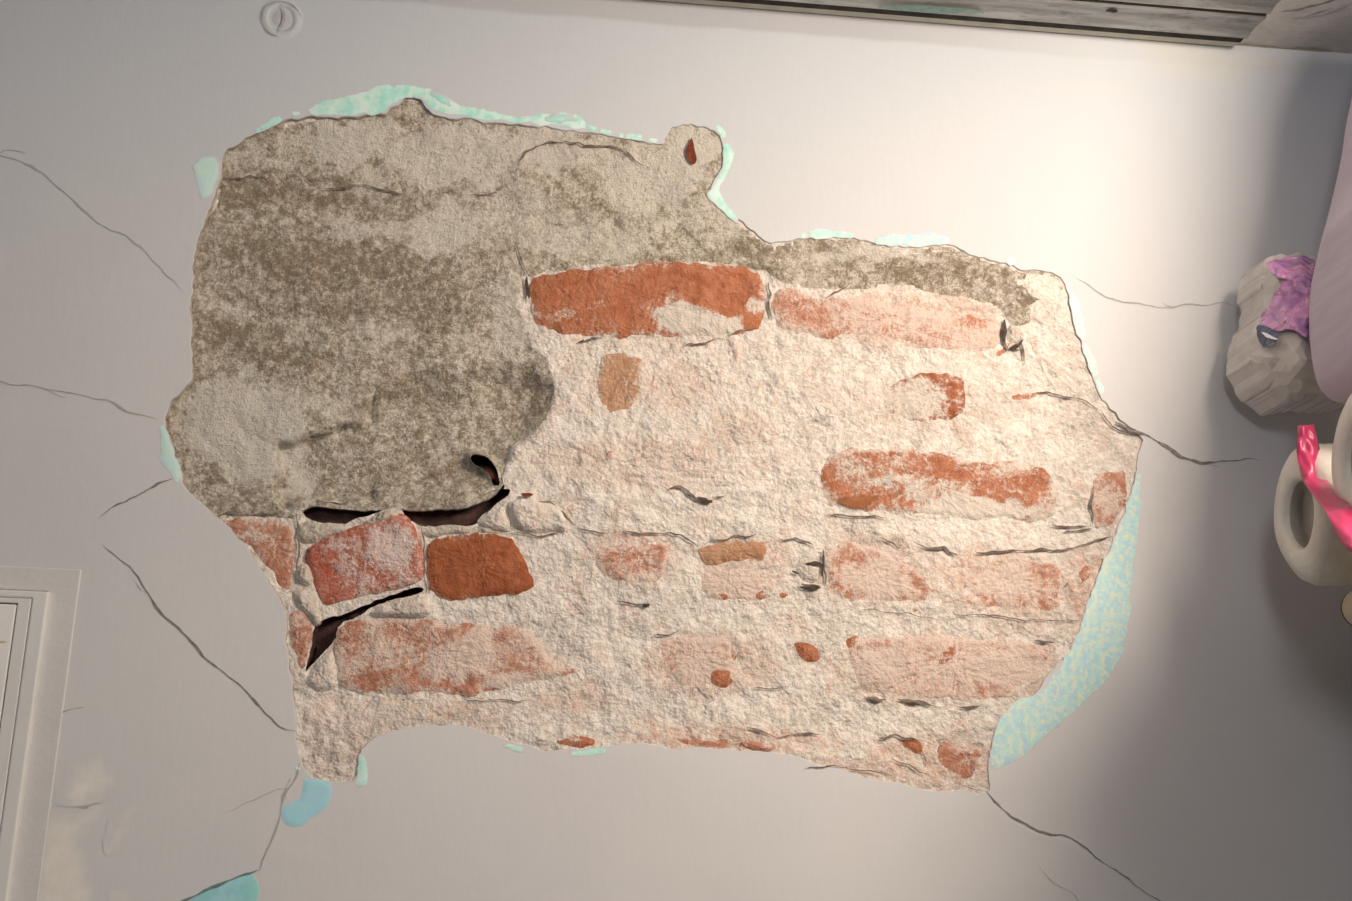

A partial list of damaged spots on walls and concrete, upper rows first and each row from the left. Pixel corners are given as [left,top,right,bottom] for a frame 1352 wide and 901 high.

crack [0,150,179,287]
crack [1080,280,1233,308]
spalling [159,84,1143,827]
crack [1115,422,1258,467]
crack [101,479,300,871]
crack [976,792,1161,901]